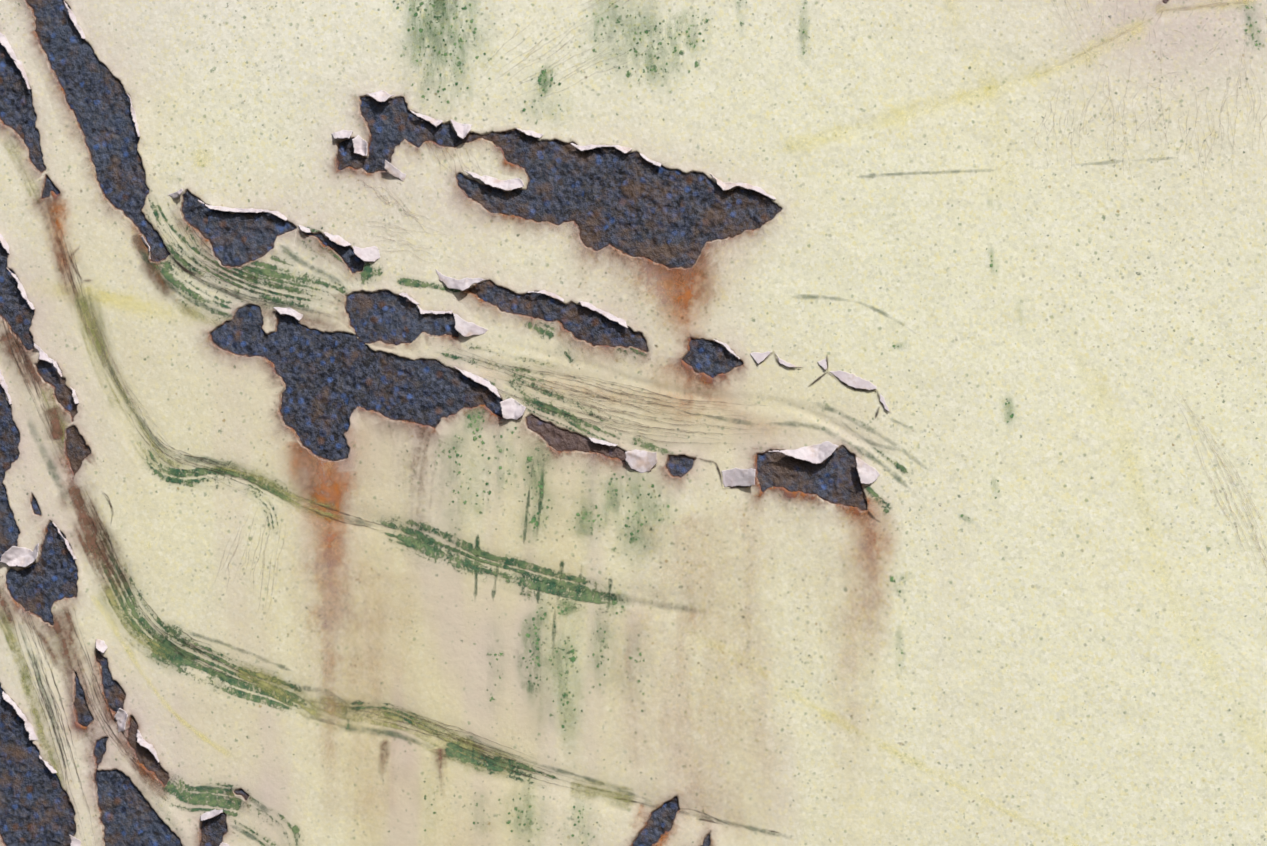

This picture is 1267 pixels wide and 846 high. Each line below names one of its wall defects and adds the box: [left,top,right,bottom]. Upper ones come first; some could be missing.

peeling [25,0,170,264]
peeling [169,188,380,273]
water stain [393,0,495,111]
peeling [331,90,782,271]
corrosion [638,260,702,322]
peeling [208,290,695,478]
peeling [0,370,78,625]
corrosion [310,458,342,563]
water stain [569,473,674,547]
water stain [381,517,624,731]
peeling [0,684,81,846]
peeling [72,639,182,846]